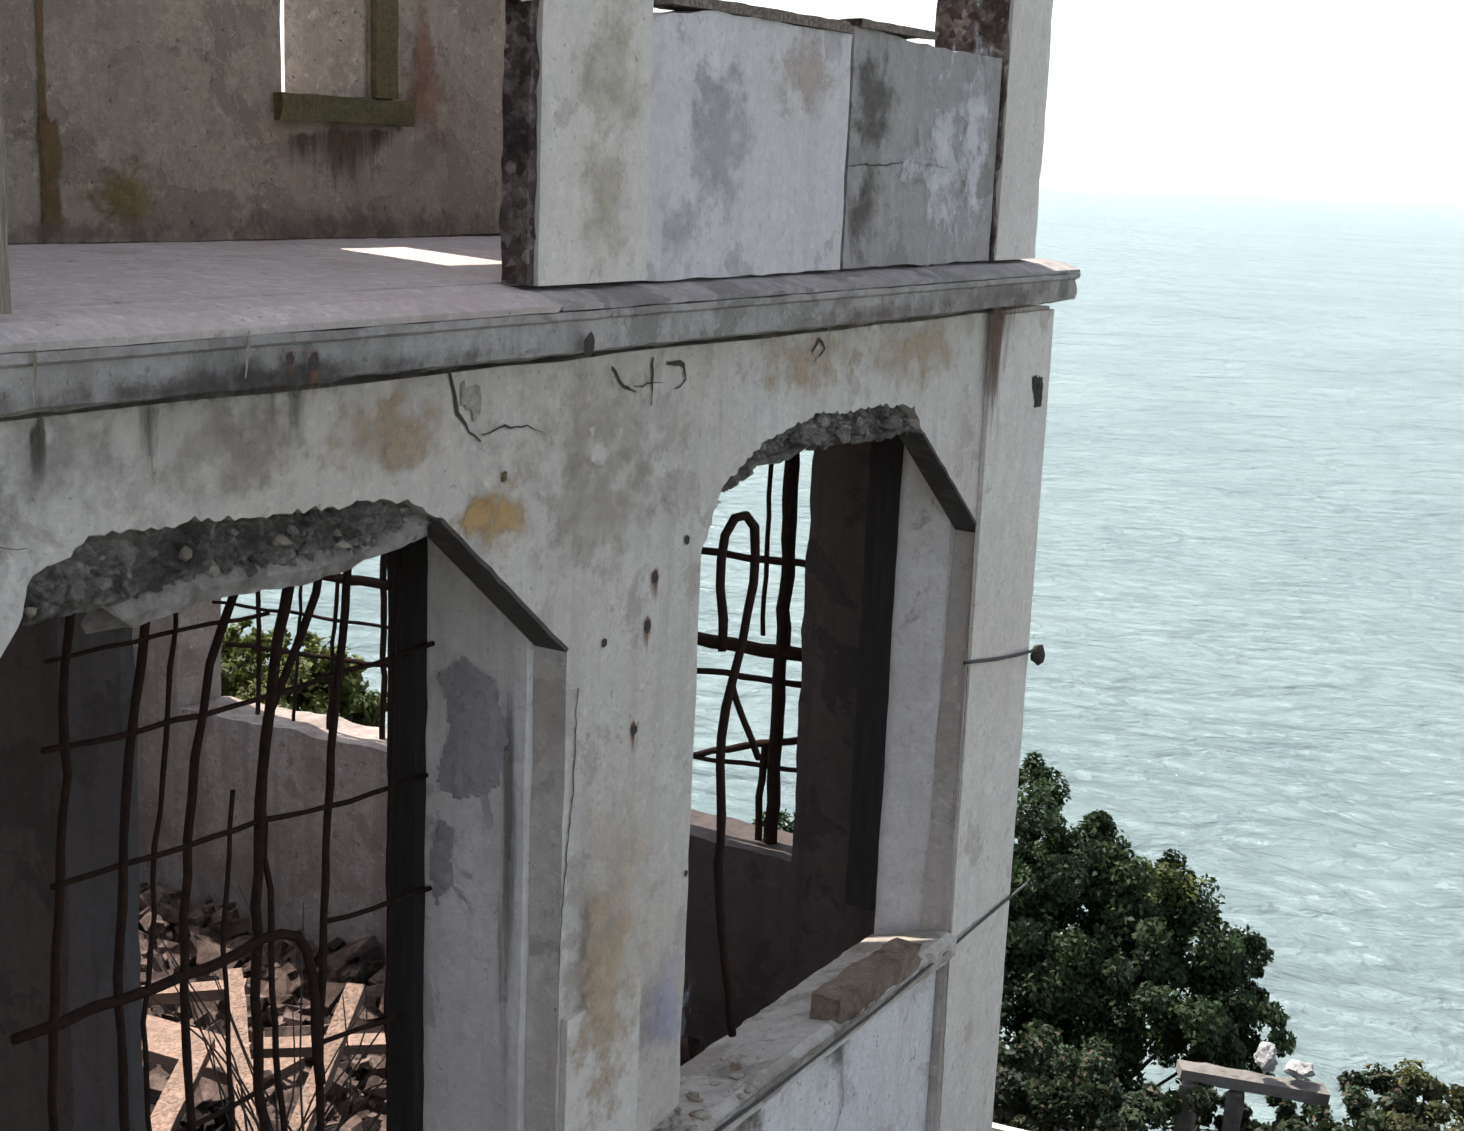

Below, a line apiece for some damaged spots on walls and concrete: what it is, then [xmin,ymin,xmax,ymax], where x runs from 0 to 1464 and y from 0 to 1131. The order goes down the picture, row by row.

crack [420,365,546,442]
crack [612,357,687,405]
spalling [693,406,914,845]
spalling [22,500,509,1131]
spalling [651,1054,761,1131]